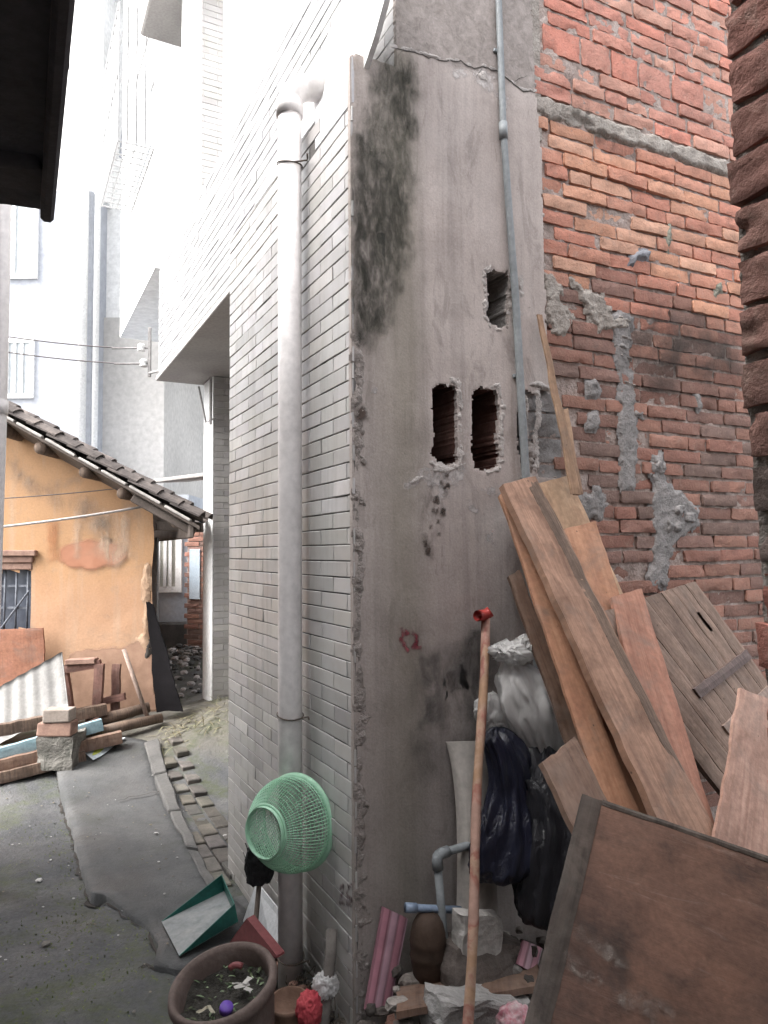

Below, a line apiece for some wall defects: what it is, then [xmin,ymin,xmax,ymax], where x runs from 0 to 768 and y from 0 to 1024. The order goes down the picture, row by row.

crack [390,44,537,93]
damp [354,62,417,339]
spalling [481,265,524,332]
spalling [349,331,376,471]
peeling [667,505,696,534]
spalling [350,487,373,1022]